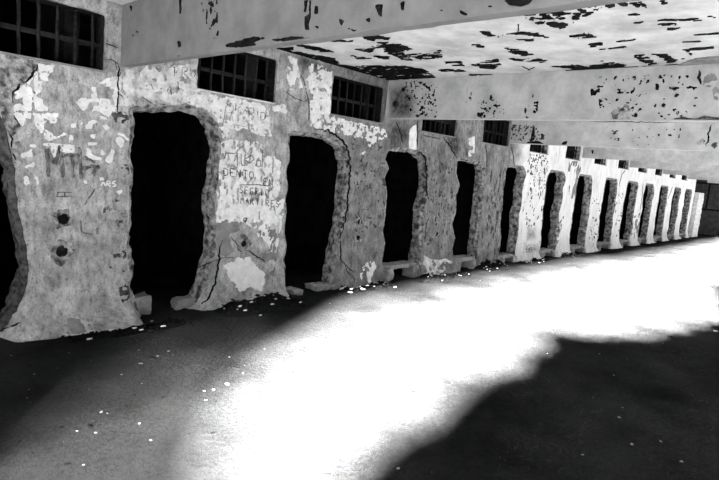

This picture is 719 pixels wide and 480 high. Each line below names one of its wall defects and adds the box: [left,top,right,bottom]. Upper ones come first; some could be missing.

crack [9,64,38,160]
crack [197,237,265,304]
crack [285,74,356,283]
flaking render [0,0,719,335]